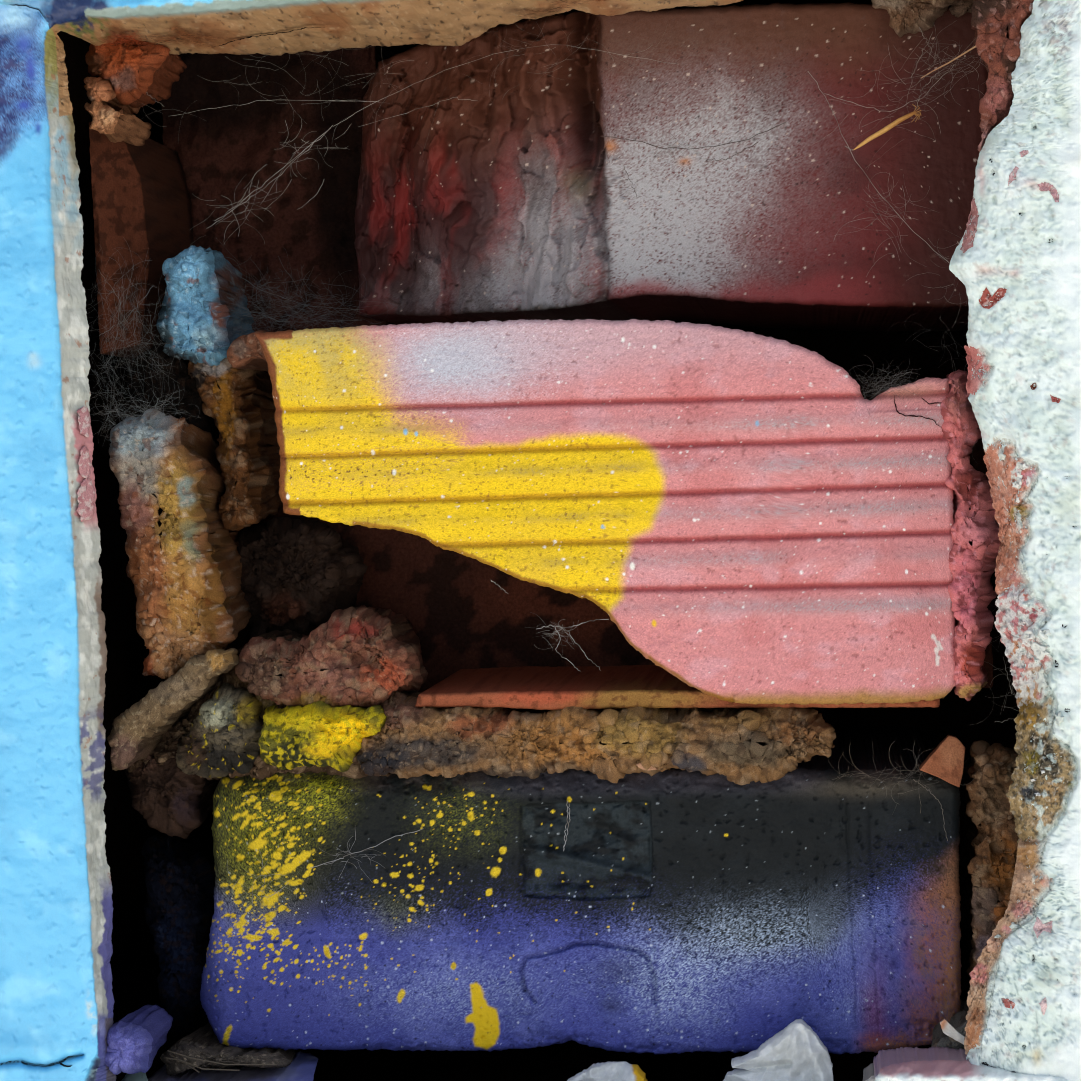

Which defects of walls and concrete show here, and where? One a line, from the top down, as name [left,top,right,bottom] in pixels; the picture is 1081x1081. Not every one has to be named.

flaking render [971,0,1034,152]
peeling [84,76,151,146]
peeling [1008,150,1029,186]
peeling [1038,182,1059,202]
peeling [960,197,979,253]
peeling [979,287,1007,309]
peeling [964,345,994,397]
peeling [76,406,96,522]
peeling [919,734,965,787]
peeling [964,437,1079,1055]
crack [1,1055,82,1067]
peeling [121,1072,148,1081]